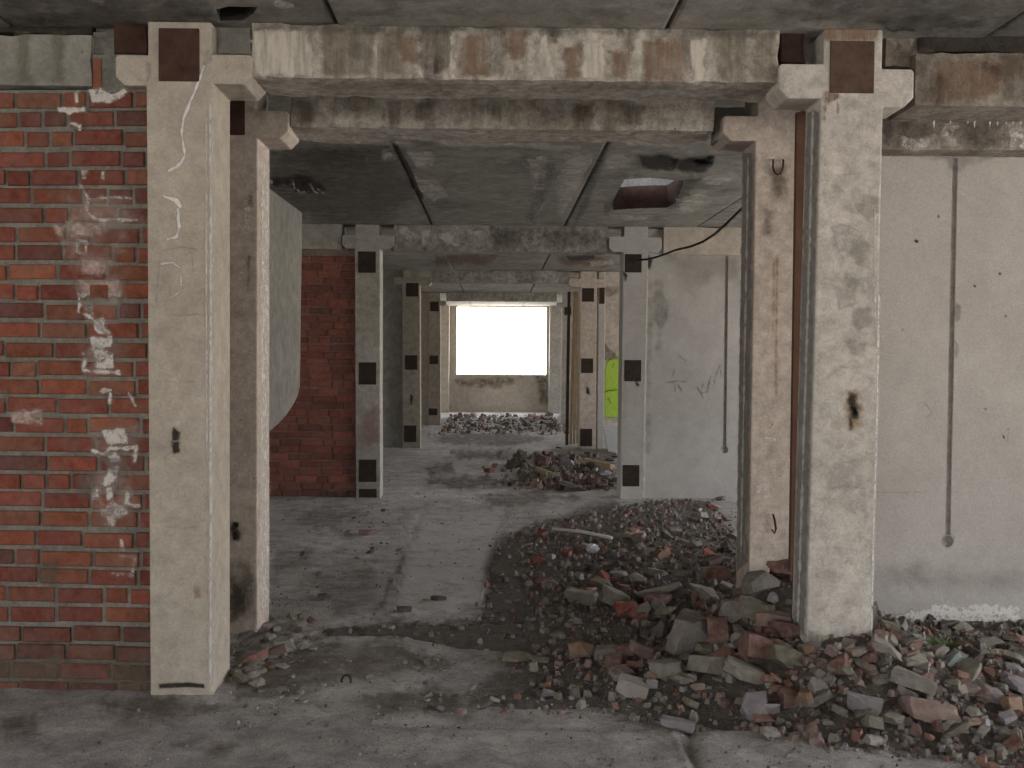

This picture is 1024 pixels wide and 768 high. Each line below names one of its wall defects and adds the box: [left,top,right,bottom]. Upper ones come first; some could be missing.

damp [626,138,769,569]
spalling [848,394,859,427]
damp [893,603,1021,622]